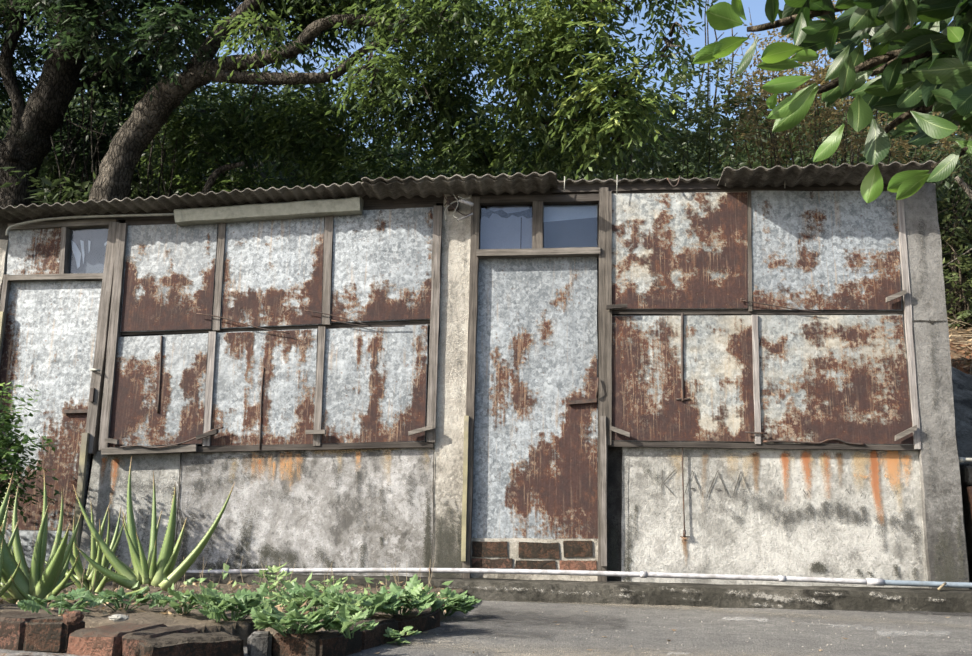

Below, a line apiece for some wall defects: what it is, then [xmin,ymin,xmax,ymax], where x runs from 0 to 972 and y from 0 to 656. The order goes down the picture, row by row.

rust [0,228,61,459]
rust [0,397,88,531]
rust [101,233,431,494]
rust [487,261,582,432]
rust [501,354,598,539]
rust [612,192,914,518]
water stain [708,489,921,580]
water stain [934,514,966,589]